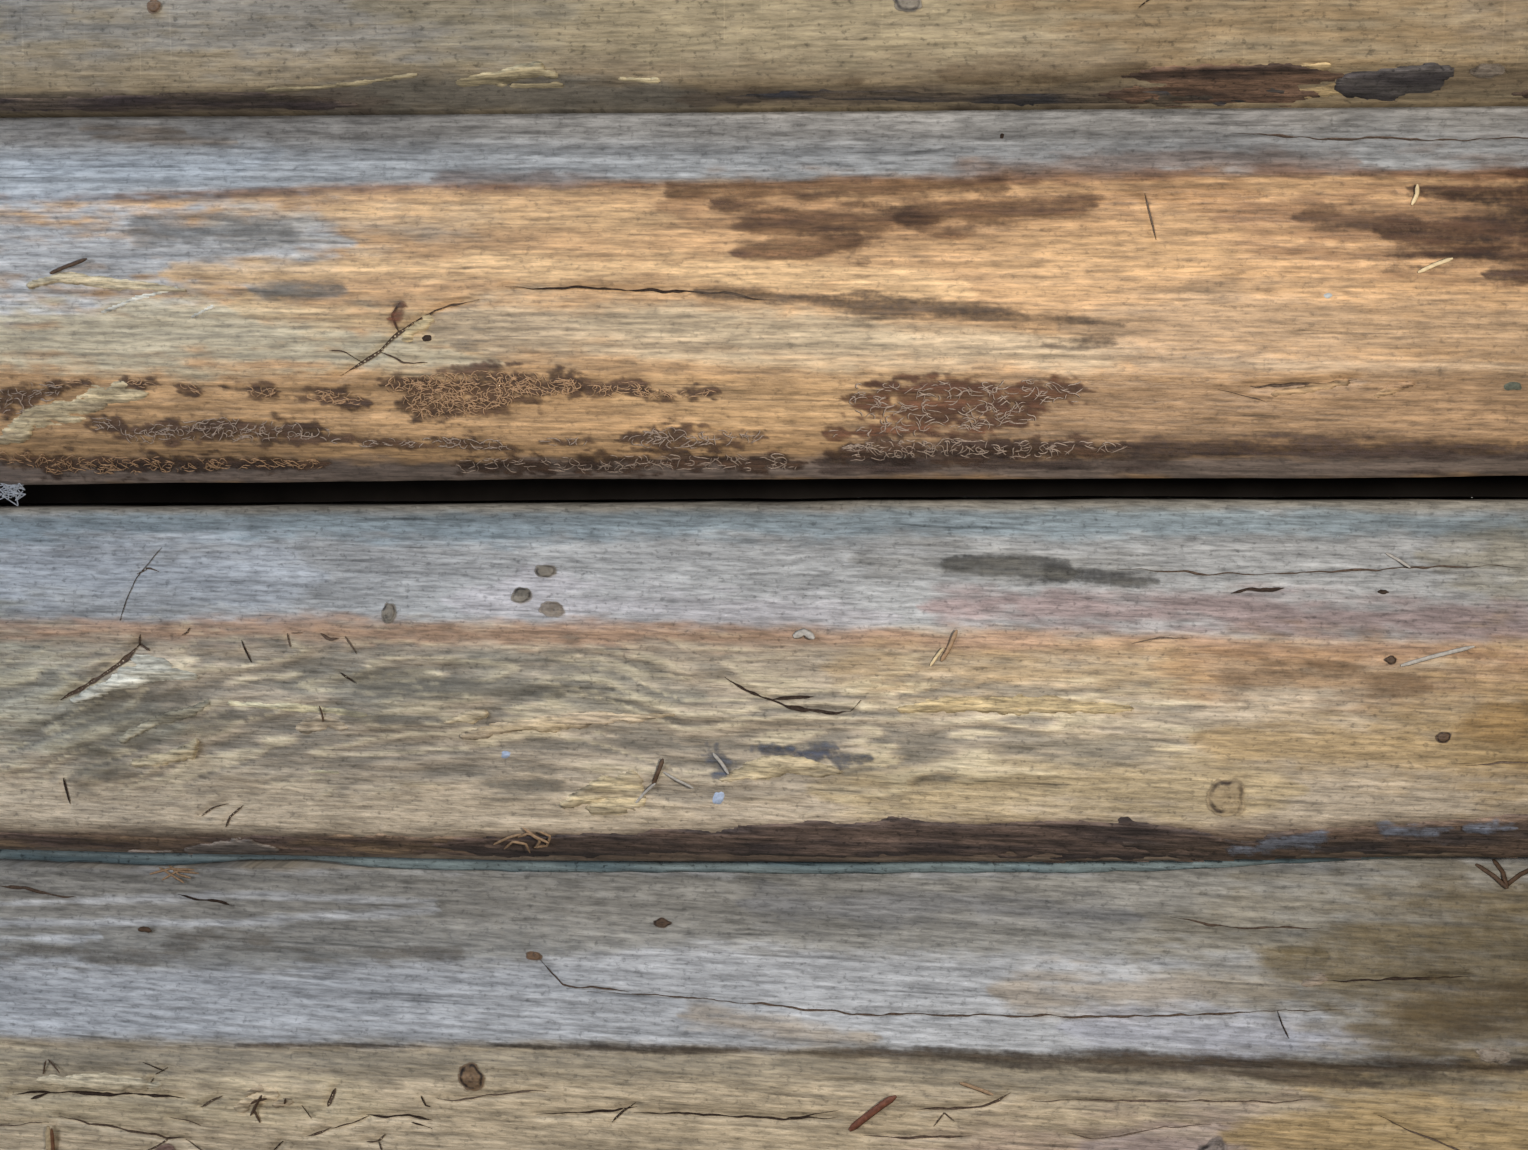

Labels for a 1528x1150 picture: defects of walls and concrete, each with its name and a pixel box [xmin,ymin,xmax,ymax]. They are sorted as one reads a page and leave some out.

leakage [665,178,1100,264]
leakage [1374,167,1528,284]
crack [330,285,777,375]
crack [541,961,1470,1038]